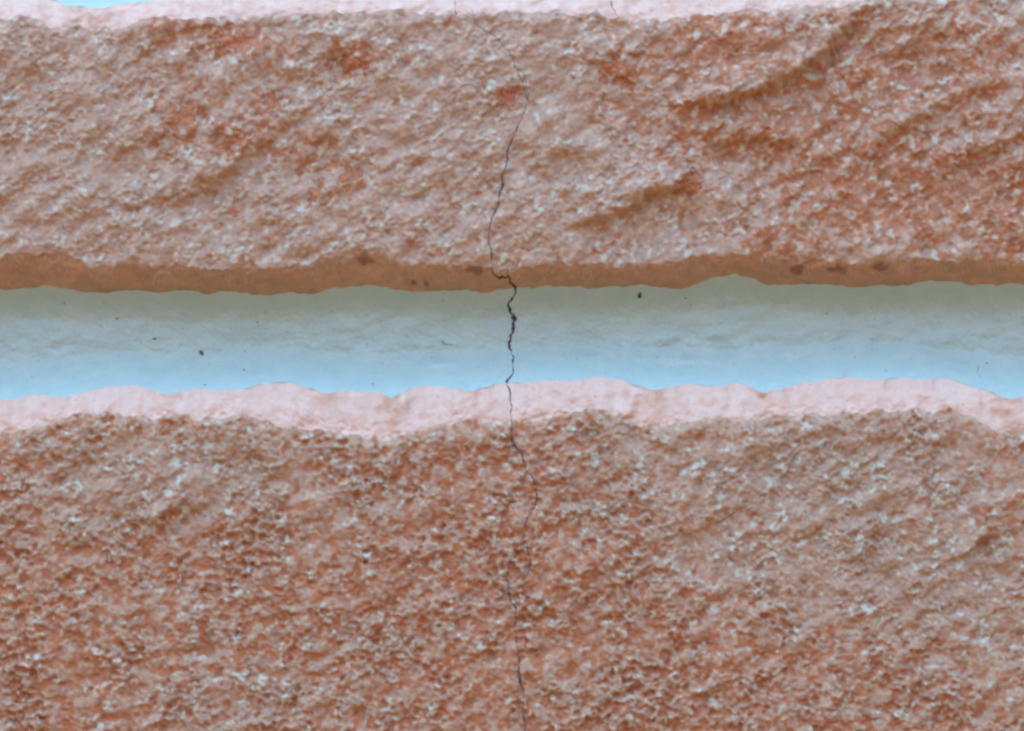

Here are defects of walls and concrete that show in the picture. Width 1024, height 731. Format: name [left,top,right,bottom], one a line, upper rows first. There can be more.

crack [454,0,538,731]